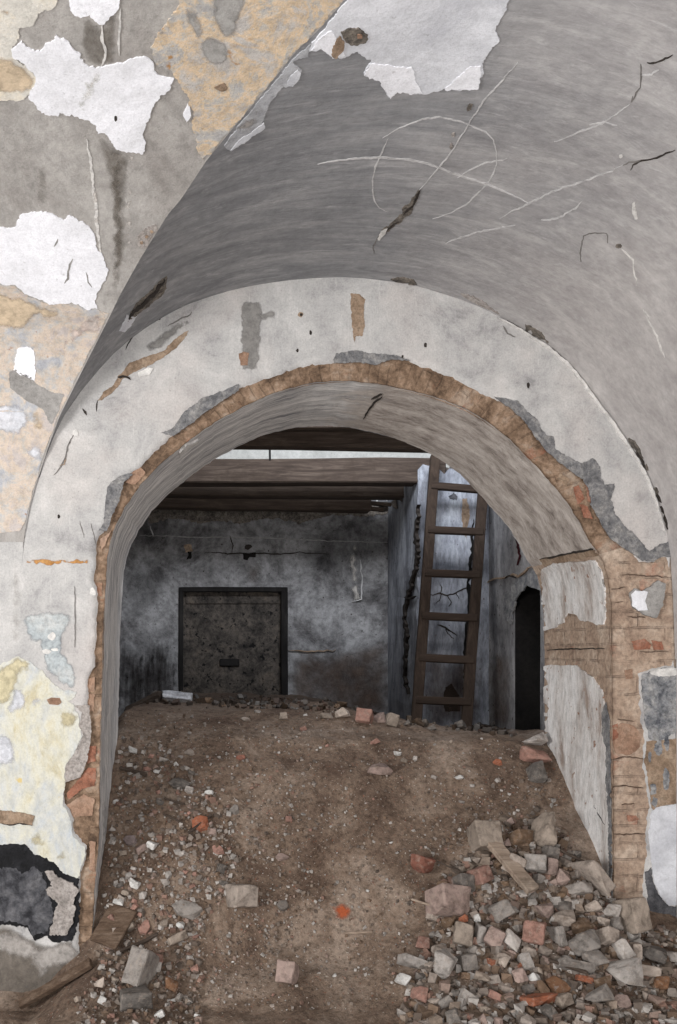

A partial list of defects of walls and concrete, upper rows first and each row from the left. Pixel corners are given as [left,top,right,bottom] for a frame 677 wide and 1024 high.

peeling [0,0,509,160]
crack [373,62,518,251]
crack [554,55,673,142]
peeling [0,211,109,533]
crack [363,394,382,419]
crack [580,232,665,358]
crack [205,536,325,560]
spalling [0,293,677,947]
crack [402,504,605,694]